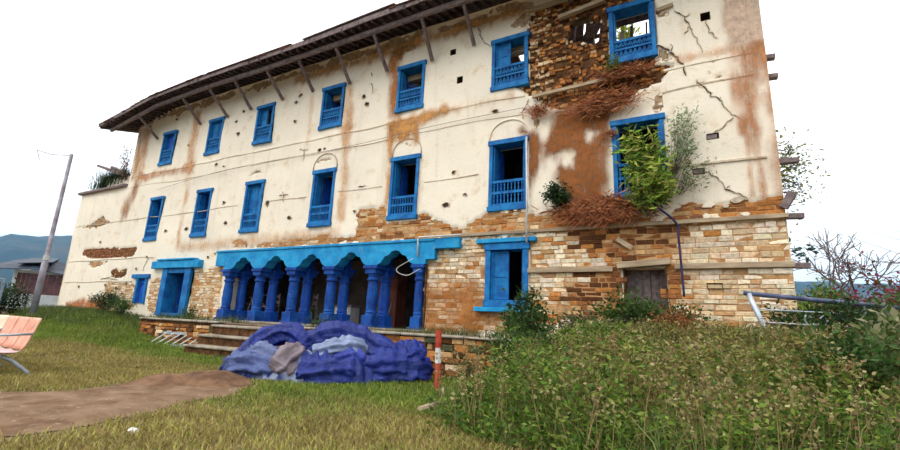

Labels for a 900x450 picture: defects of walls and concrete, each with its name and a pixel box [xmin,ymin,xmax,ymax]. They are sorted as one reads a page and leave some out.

damp [122,112,200,216]
peeling [142,28,423,127]
damp [296,36,448,213]
damp [435,9,524,38]
spalling [437,0,673,112]
crack [656,10,741,133]
damp [732,42,769,136]
spalling [83,216,110,229]
spalling [82,241,137,310]
spalling [146,278,161,314]
spalling [231,195,798,335]